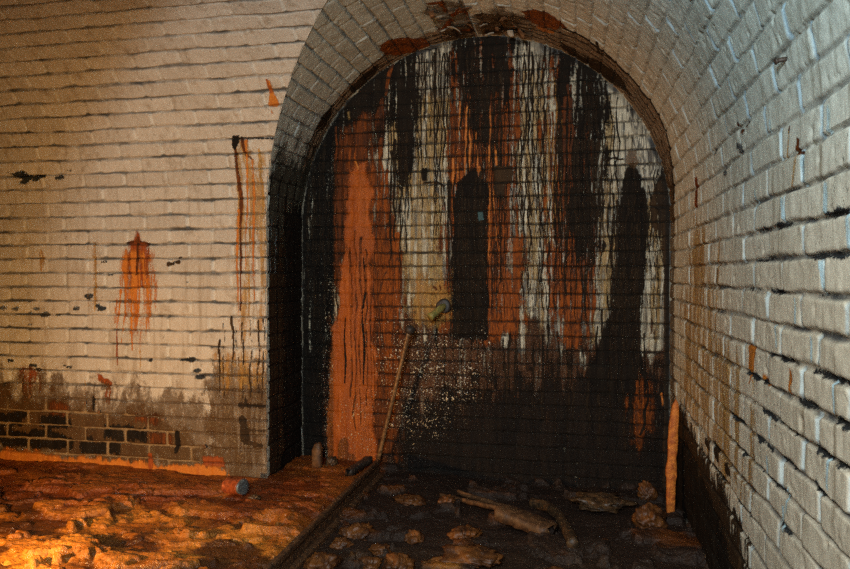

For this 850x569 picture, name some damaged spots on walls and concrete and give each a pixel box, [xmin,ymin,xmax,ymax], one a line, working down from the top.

corrosion [266,79,280,114]
corrosion [522,9,567,33]
corrosion [97,374,112,401]
corrosion [114,231,158,367]
corrosion [232,135,274,341]
corrosion [323,37,530,464]
leakage [180,36,752,569]
corrosion [538,56,602,351]
corrosion [625,150,772,500]
leakage [757,434,793,535]